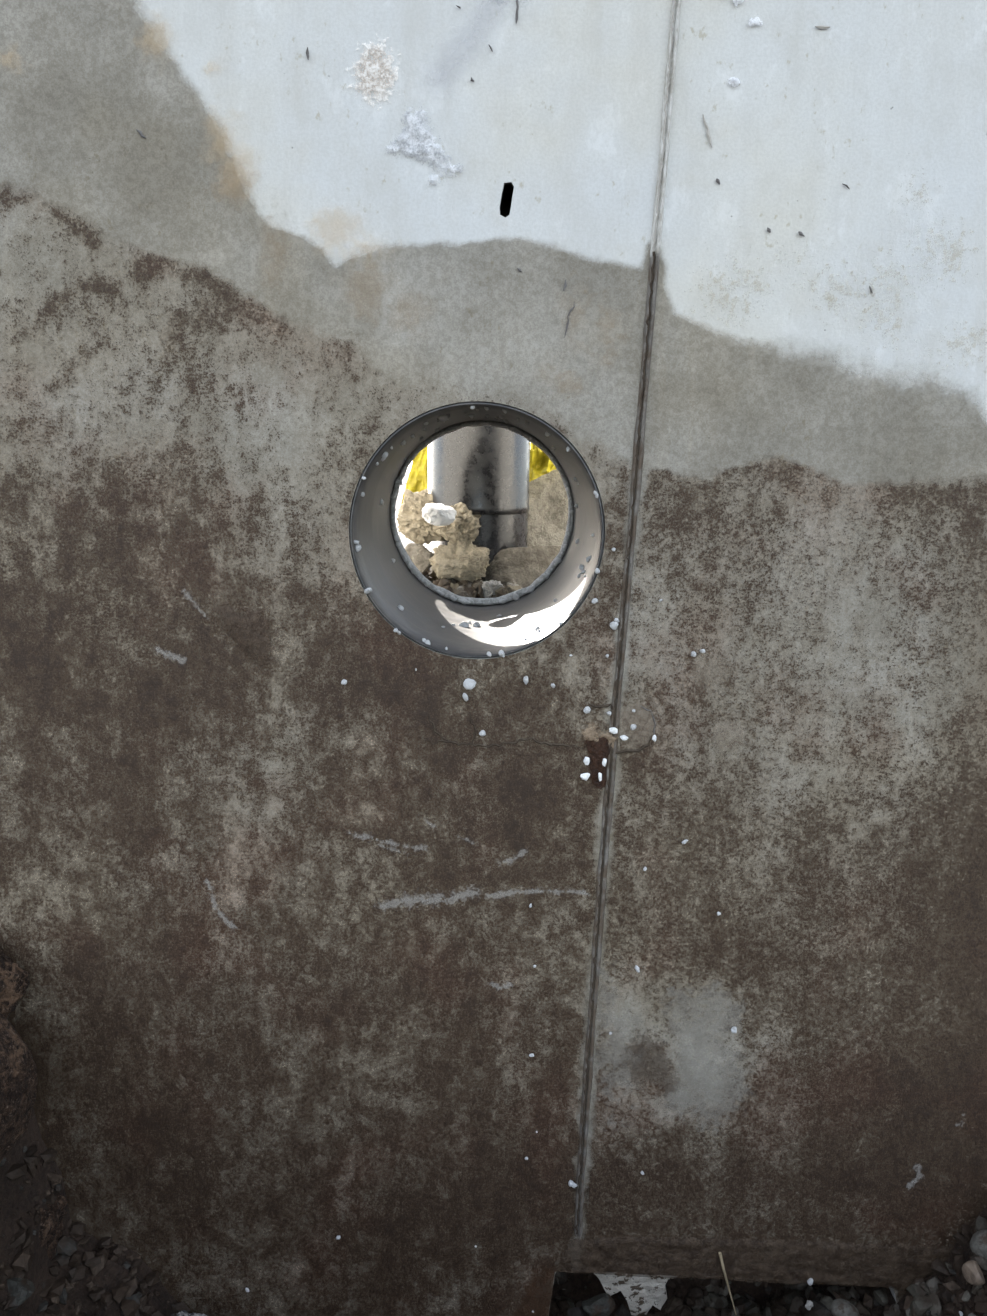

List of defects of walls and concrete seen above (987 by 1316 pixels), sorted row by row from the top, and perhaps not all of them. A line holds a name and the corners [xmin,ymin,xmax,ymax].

leakage [0,872,89,931]
leakage [207,679,381,906]
leakage [0,0,651,736]
crack [422,0,676,1234]
crack [703,114,712,148]
leakage [537,256,987,1247]